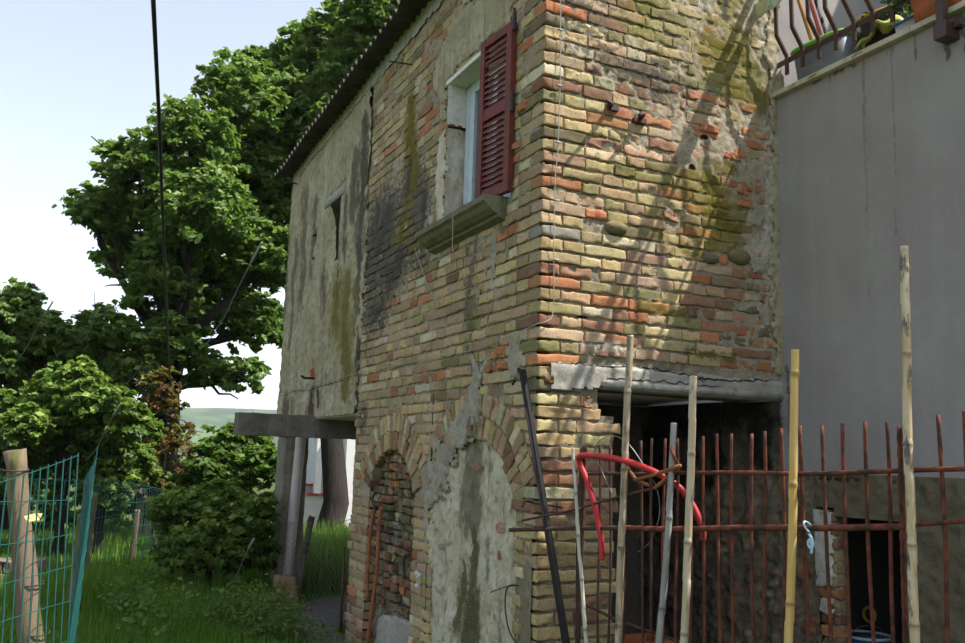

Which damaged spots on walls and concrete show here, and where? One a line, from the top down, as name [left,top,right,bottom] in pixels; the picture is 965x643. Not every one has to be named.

peeling [433,0,518,221]
water stain [287,111,407,401]
spalling [485,346,508,373]
spalling [540,375,554,385]